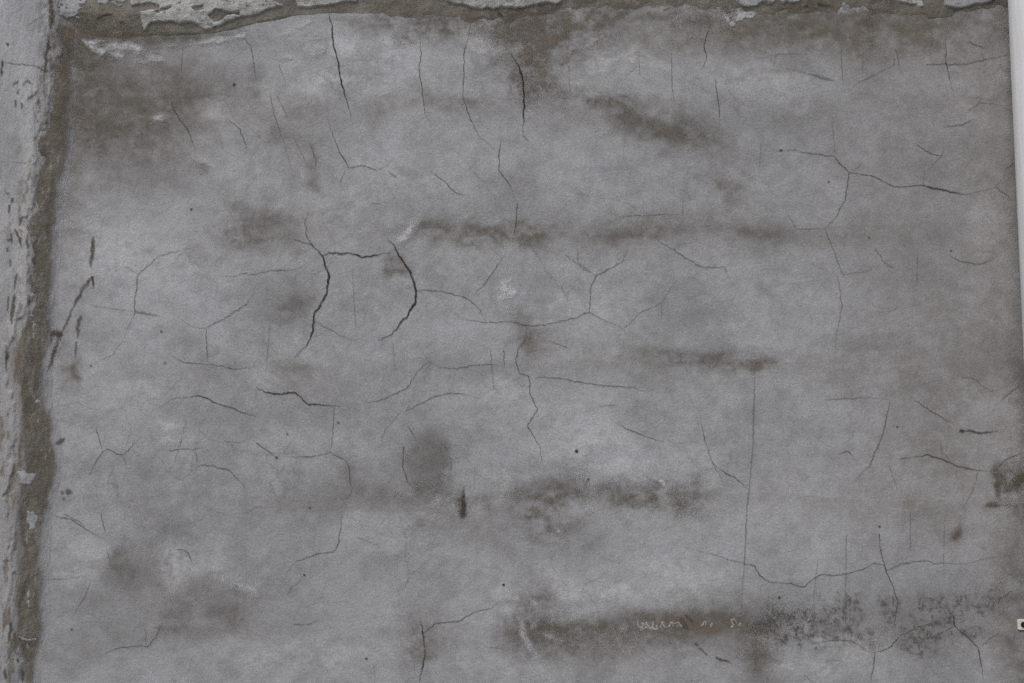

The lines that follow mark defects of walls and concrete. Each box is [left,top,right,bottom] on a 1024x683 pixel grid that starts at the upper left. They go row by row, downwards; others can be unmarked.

flaking render [296,0,358,8]
flaking render [446,0,563,16]
flaking render [716,0,869,30]
flaking render [898,0,924,8]
flaking render [944,0,993,9]
crack [329,16,350,111]
crack [512,56,525,123]
spalling [5,0,283,680]
crack [297,241,616,440]
crack [260,389,336,406]
crack [419,610,480,680]
damp [507,594,871,649]